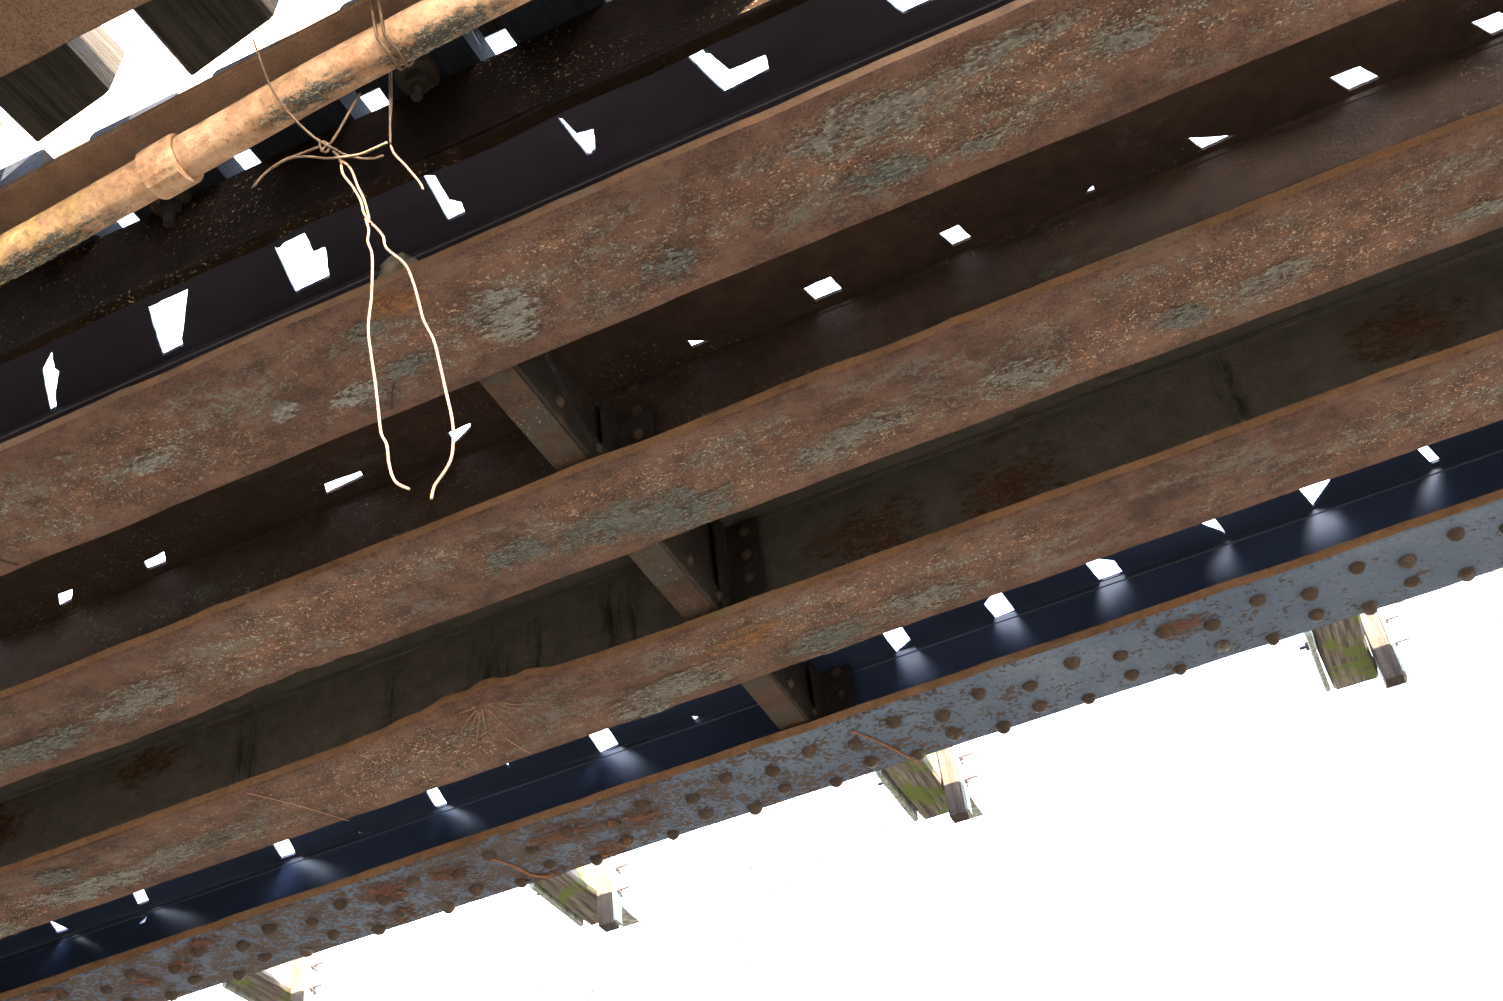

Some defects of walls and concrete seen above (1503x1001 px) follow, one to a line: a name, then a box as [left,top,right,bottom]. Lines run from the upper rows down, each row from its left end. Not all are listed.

corrosion [956,452,1067,519]
corrosion [819,497,923,566]
corrosion [522,809,666,859]
corrosion [359,861,479,925]